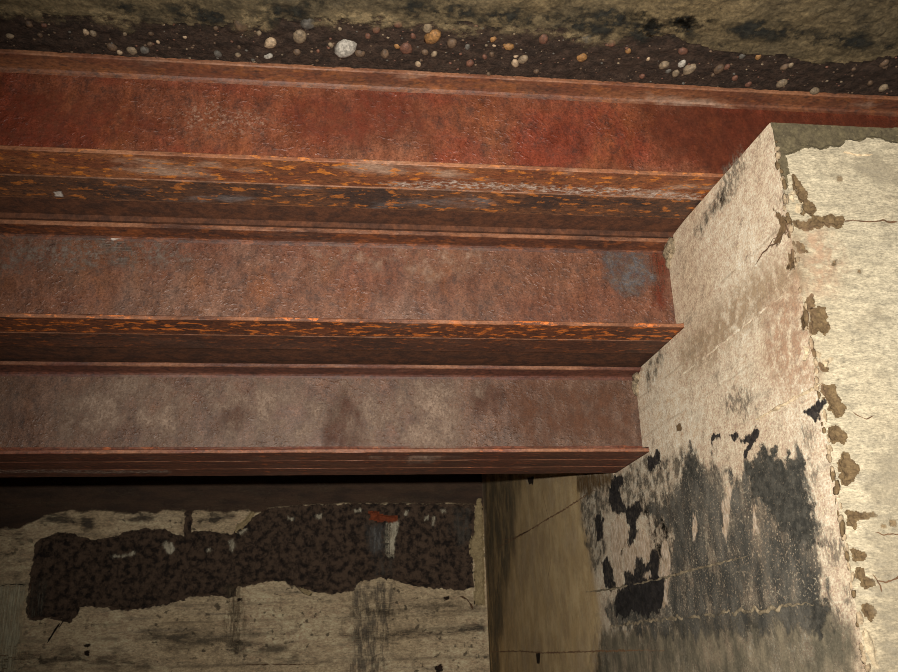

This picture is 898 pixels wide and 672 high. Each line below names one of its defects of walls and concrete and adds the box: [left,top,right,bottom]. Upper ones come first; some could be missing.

rust [642,104,801,166]
rust [812,112,893,128]
crack [755,234,783,265]
flaking render [771,122,898,272]
crack [842,217,897,225]
spalling [798,287,880,672]
spalling [26,503,475,623]